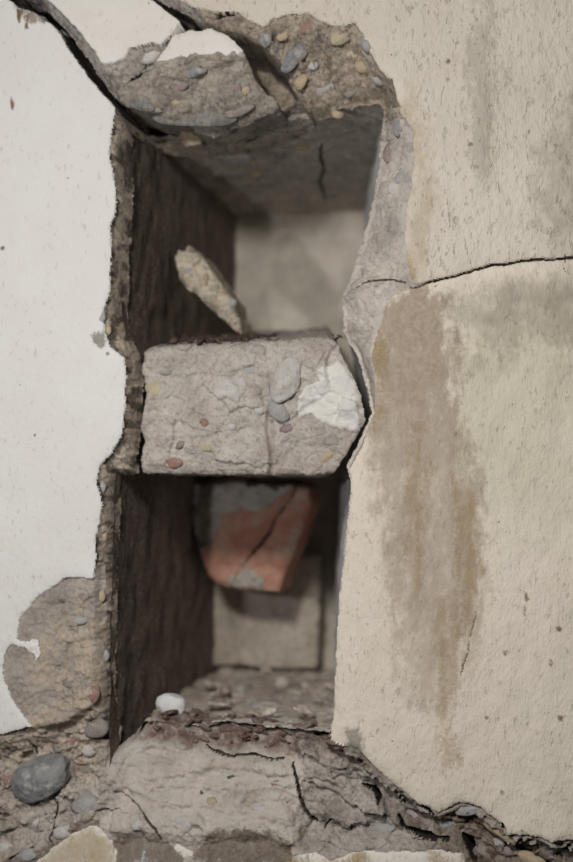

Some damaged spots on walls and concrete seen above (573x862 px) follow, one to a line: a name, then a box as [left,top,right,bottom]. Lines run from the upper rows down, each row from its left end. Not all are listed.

spalling [27,0,172,107]
crack [318,144,326,200]
spalling [157,0,427,481]
crack [356,254,573,289]
spalling [85,109,312,727]
spalling [0,564,573,862]
crack [363,783,382,806]
crack [9,797,59,861]
water stain [41,828,293,862]
crack [397,804,478,862]
crack [501,822,550,862]